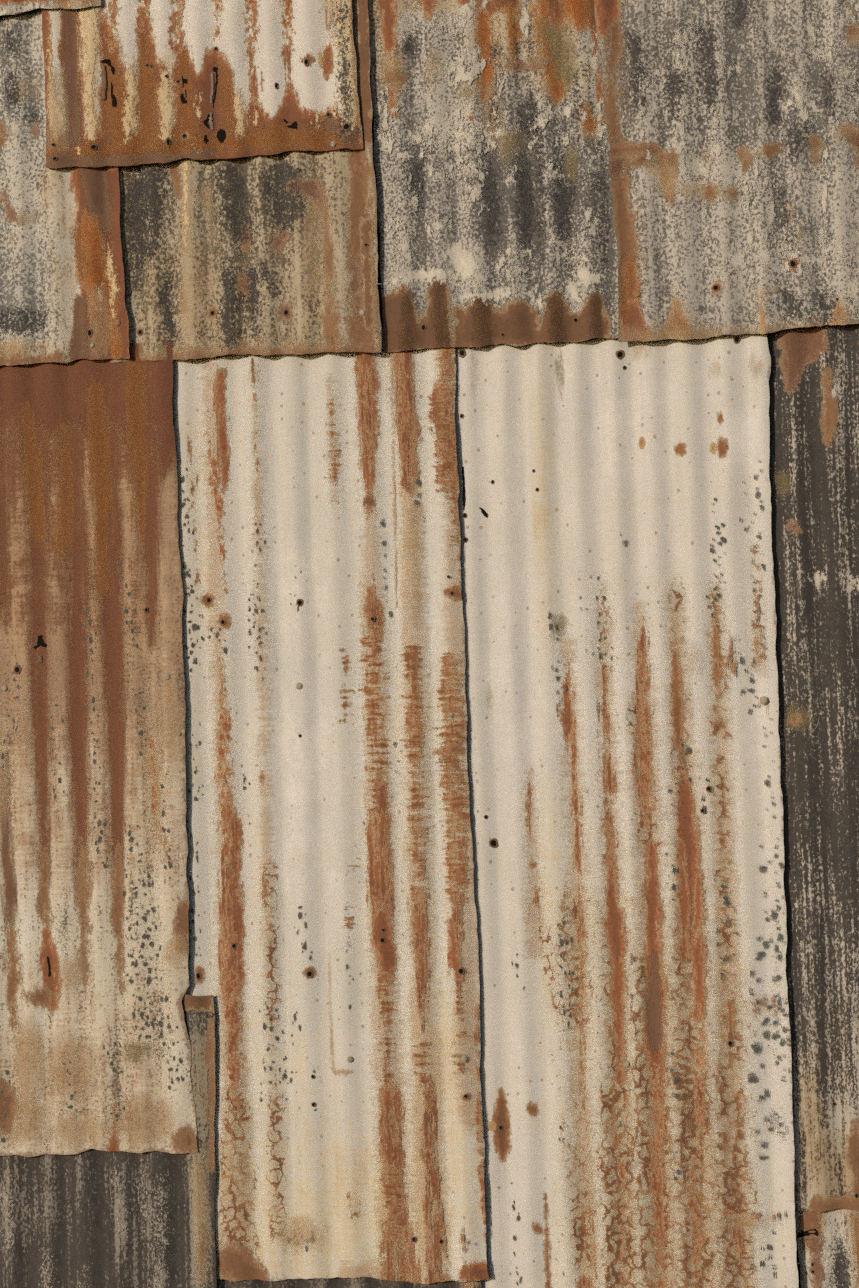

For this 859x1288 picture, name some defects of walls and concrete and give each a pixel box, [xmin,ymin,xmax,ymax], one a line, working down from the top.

rust [704,141,786,204]
rust [840,123,859,169]
rust [759,301,852,447]
rust [710,412,728,458]
rust [0,0,698,1031]
rust [338,552,512,1288]
rust [528,544,859,1288]
rust [171,657,286,1282]
rust [0,1078,20,1135]
rust [106,1104,119,1152]
rust [526,1102,538,1116]